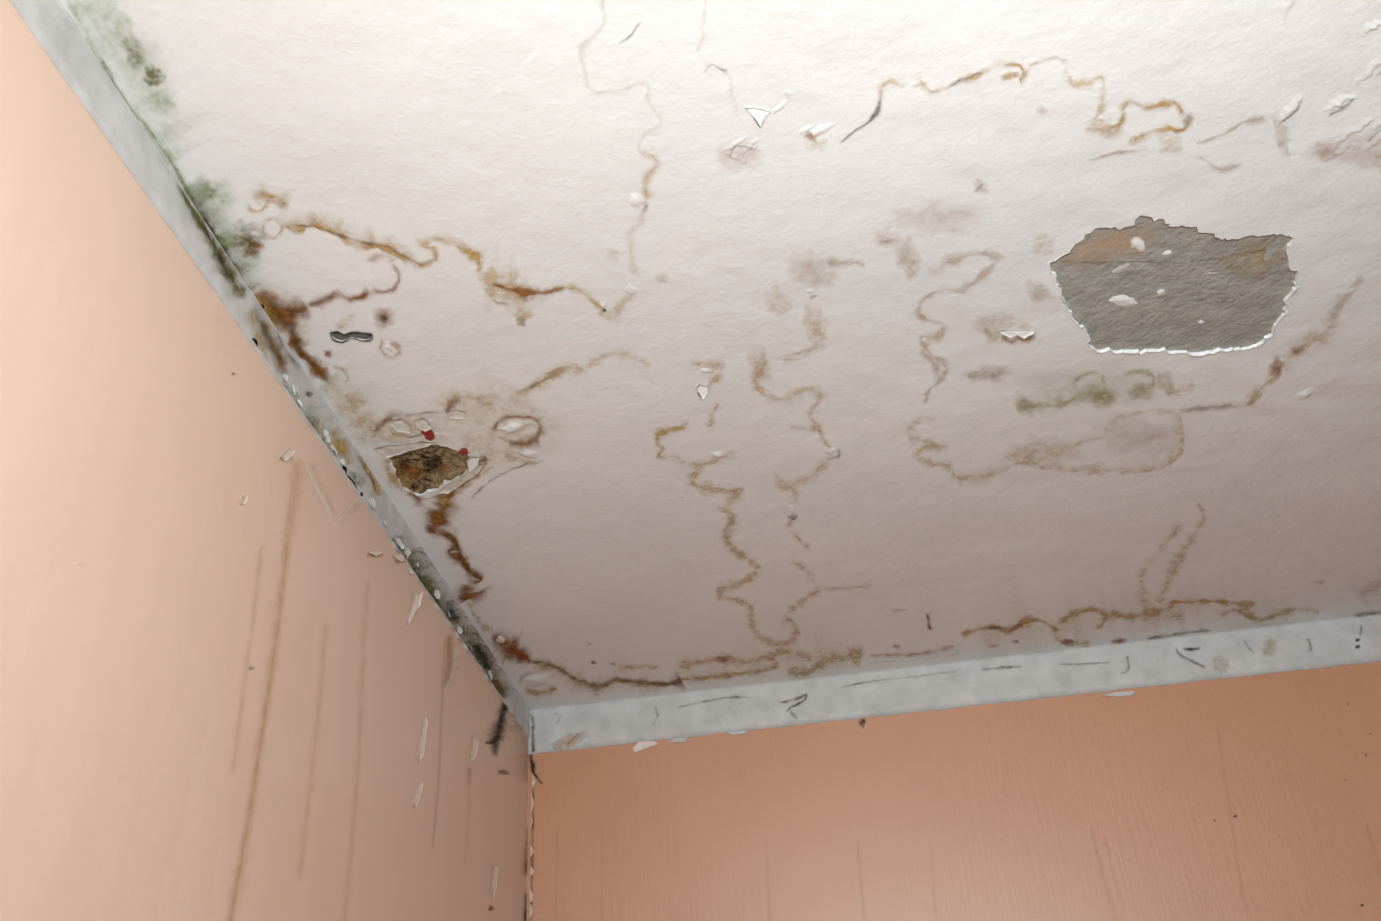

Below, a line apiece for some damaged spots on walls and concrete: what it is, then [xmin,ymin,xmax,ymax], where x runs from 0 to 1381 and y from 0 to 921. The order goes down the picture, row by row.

damp [129,49,159,85]
damp [1145,101,1186,132]
damp [165,152,405,296]
damp [462,248,574,317]
peeling [1048,216,1301,358]
damp [527,363,592,392]
damp [696,363,721,426]
spalling [374,412,486,502]
damp [656,426,684,457]
damp [657,451,861,686]
damp [393,539,507,752]
damp [963,591,1291,644]